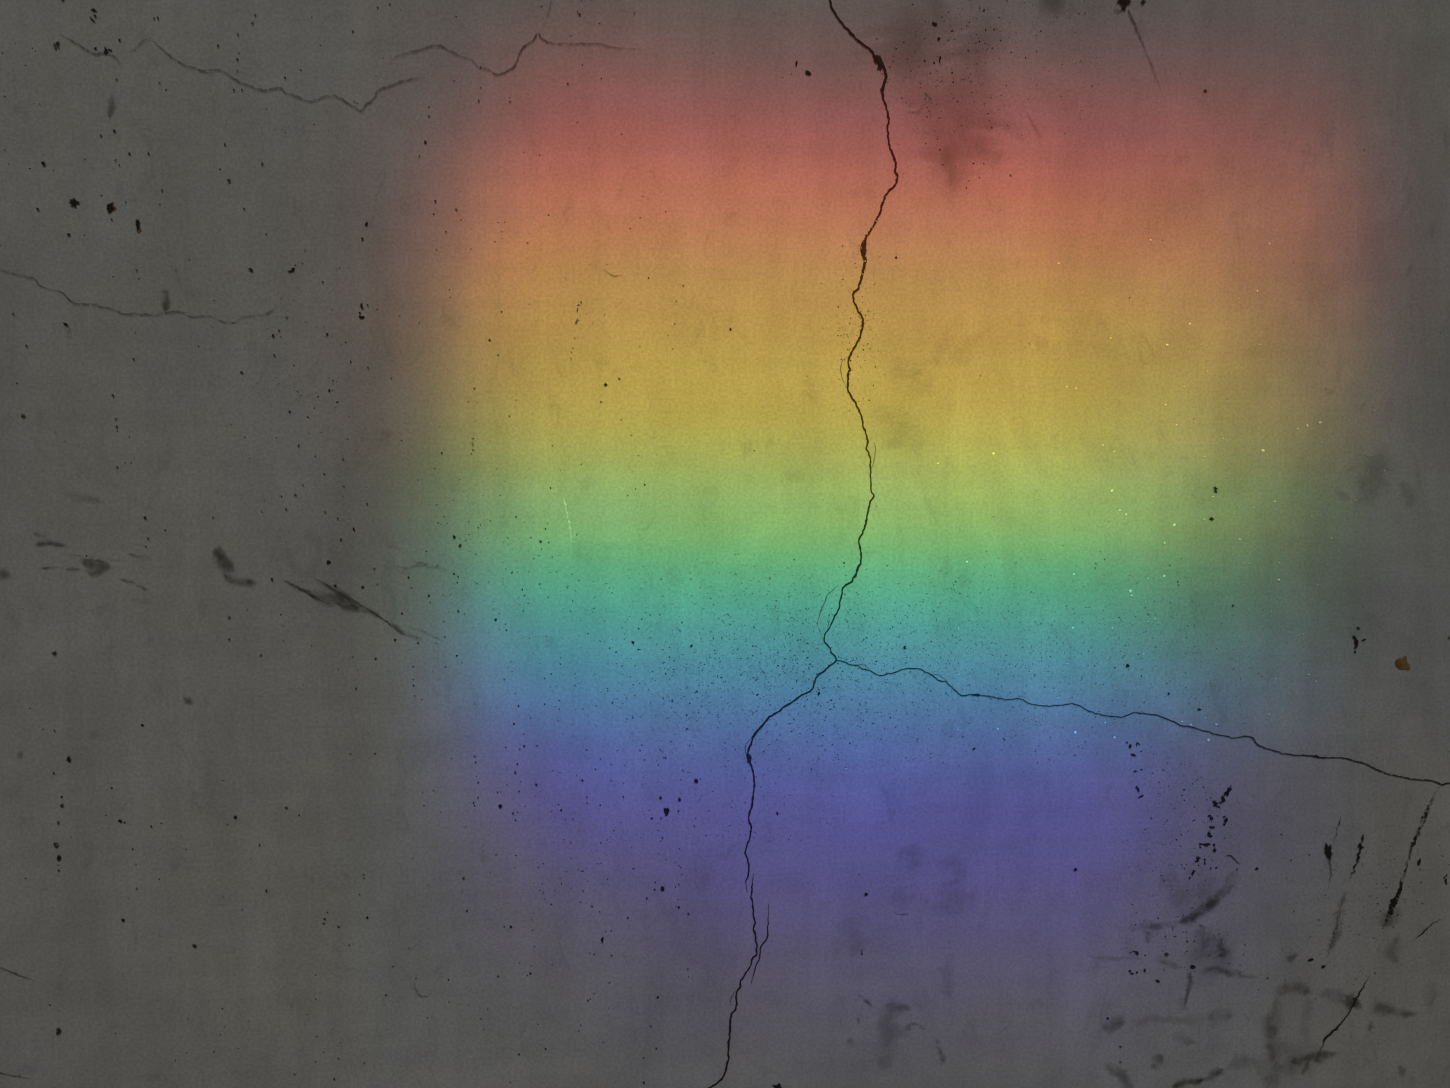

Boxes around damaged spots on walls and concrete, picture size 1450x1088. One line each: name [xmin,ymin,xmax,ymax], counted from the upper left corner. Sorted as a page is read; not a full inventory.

crack [493,33,597,75]
crack [708,0,1450,1088]